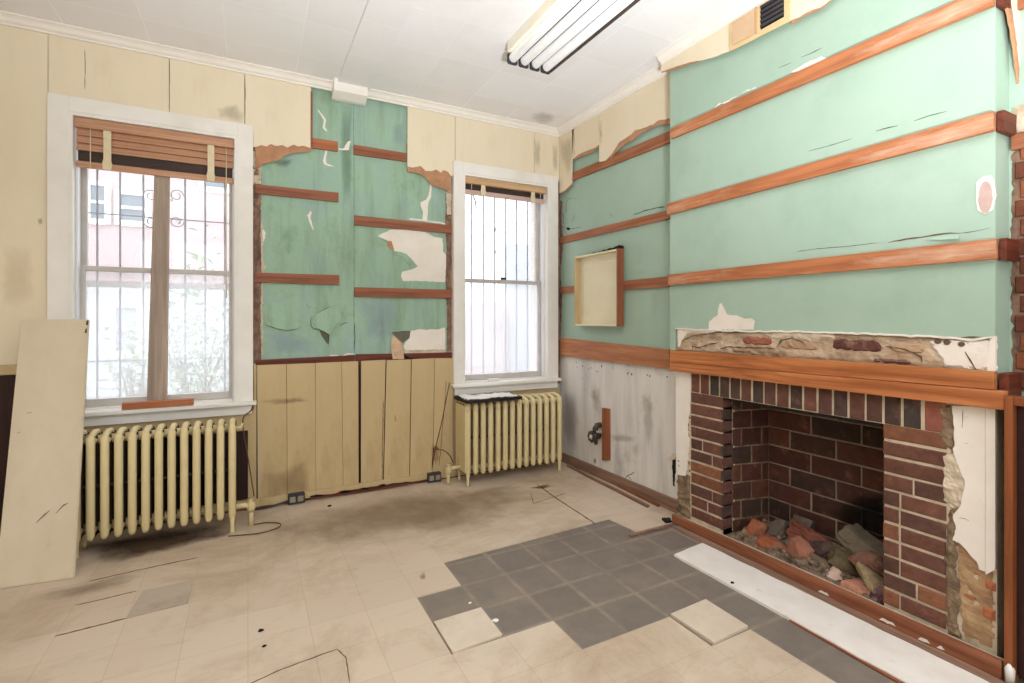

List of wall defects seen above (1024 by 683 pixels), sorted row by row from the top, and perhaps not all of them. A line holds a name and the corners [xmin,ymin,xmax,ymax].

flaking render [976,176,997,214]
spalling [253,147,267,364]
peeling [375,184,452,359]
crack [888,228,988,243]
flaking render [675,303,998,371]
flaking render [937,405,999,648]
crack [252,649,350,683]